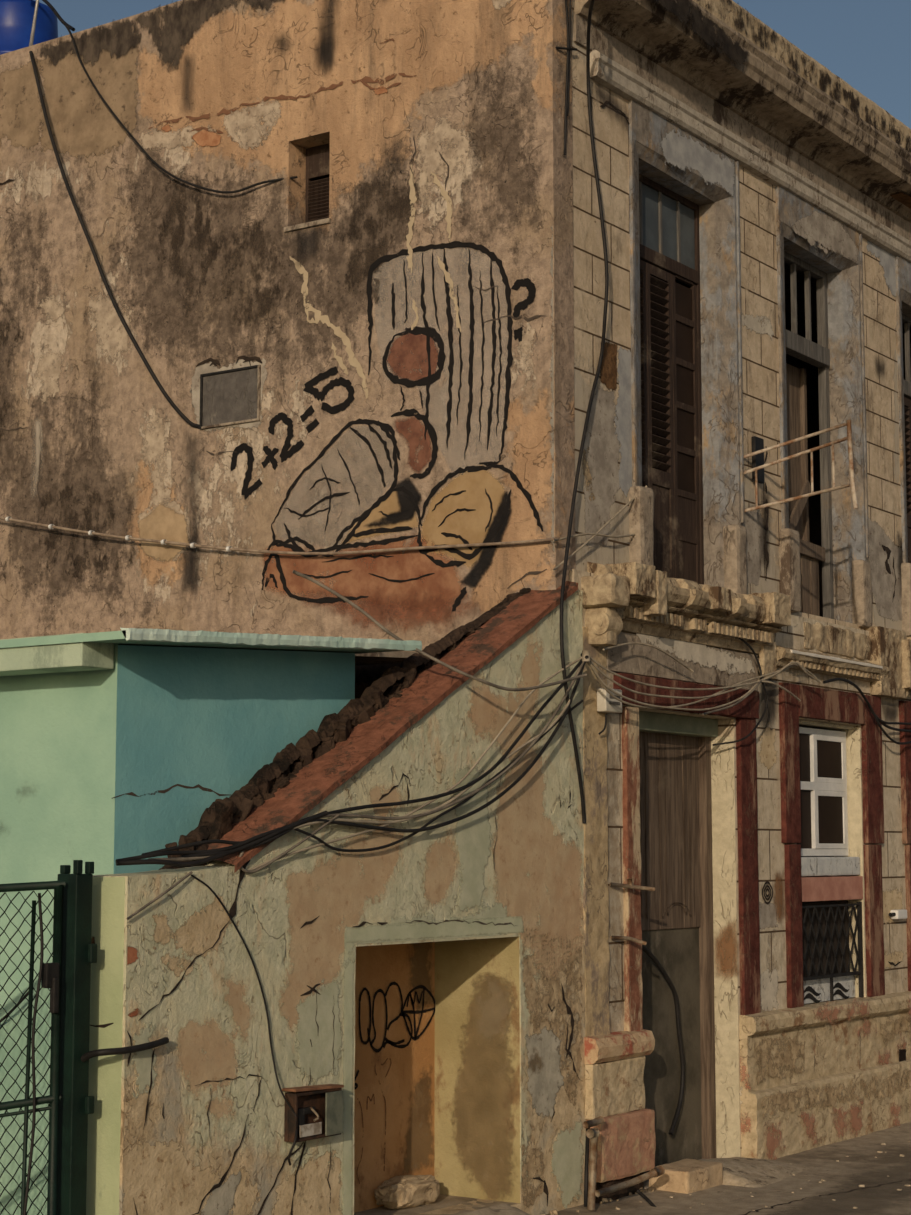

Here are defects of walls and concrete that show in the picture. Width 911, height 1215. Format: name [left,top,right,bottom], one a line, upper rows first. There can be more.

peeling [0,46,282,158]
leakage [40,0,285,106]
leakage [319,0,334,64]
leakage [652,0,911,153]
crack [289,256,368,399]
peeling [636,511,791,679]
peeling [864,518,911,700]
crack [112,784,229,799]
peeling [453,643,583,1105]
peeling [122,1008,343,1215]
crack [257,1141,331,1215]
leakage [453,973,514,1201]